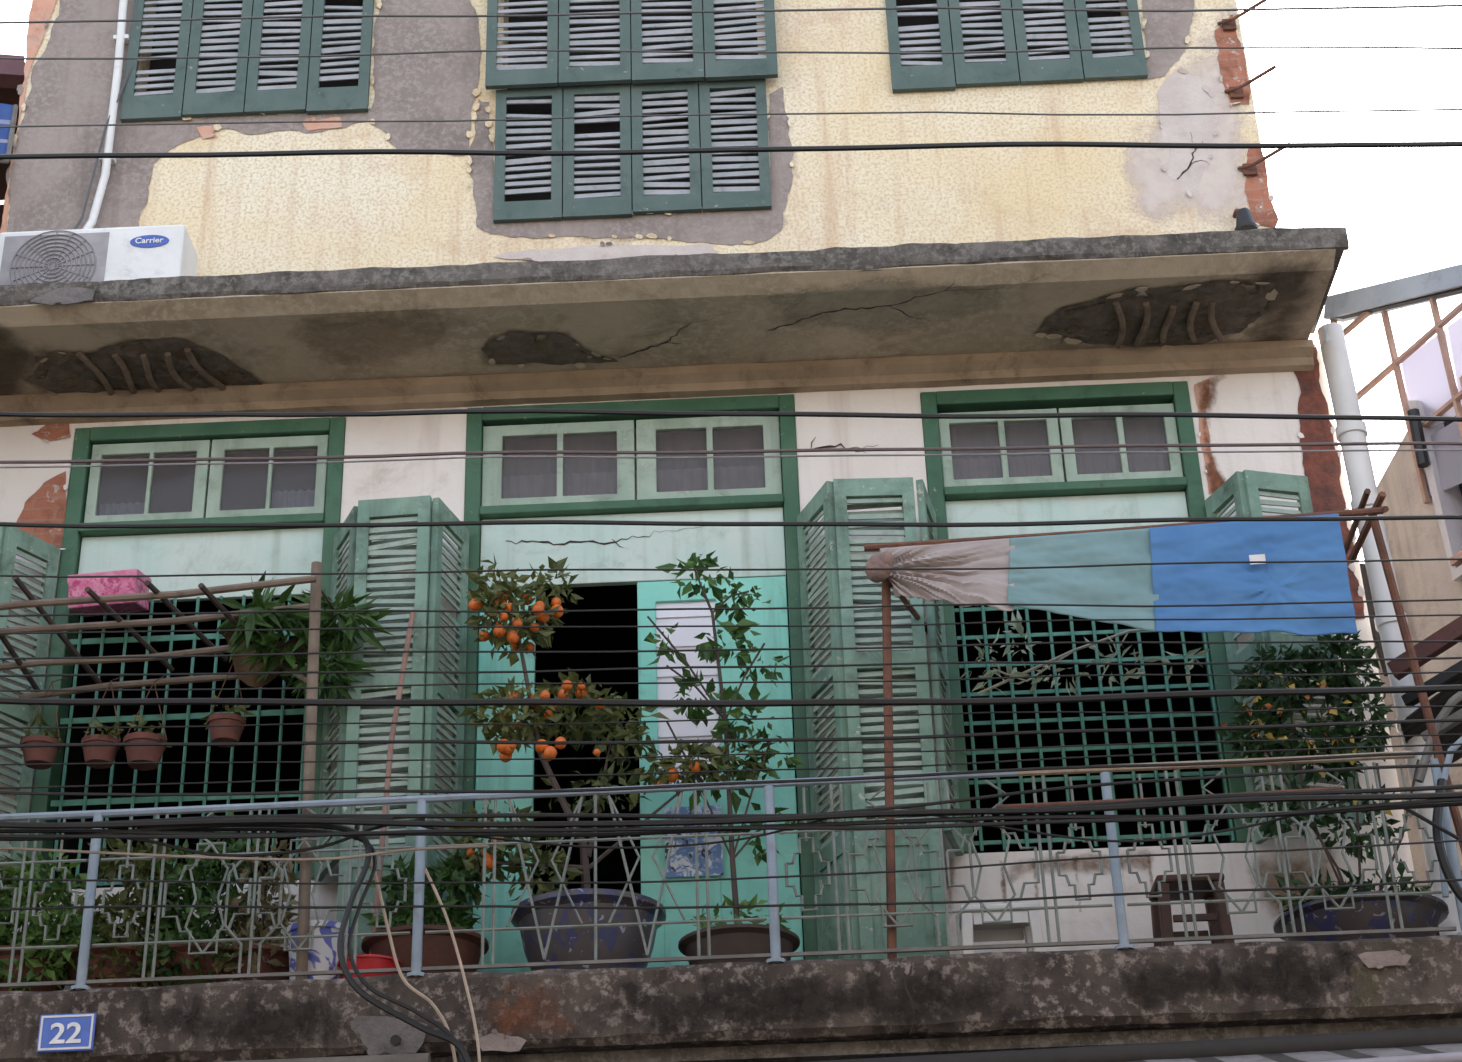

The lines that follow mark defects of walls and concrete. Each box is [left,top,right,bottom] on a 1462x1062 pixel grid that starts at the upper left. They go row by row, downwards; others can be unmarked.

peeling [0,0,794,261]
flaking render [1126,0,1279,227]
spalling [26,338,262,396]
spalling [481,331,618,368]
crack [619,312,733,358]
crack [768,274,1048,331]
spalling [1035,280,1278,350]
flaking render [32,423,71,442]
spalling [1194,379,1217,494]
flaking render [17,471,68,550]
crack [511,526,703,548]
flaking render [1293,344,1365,619]